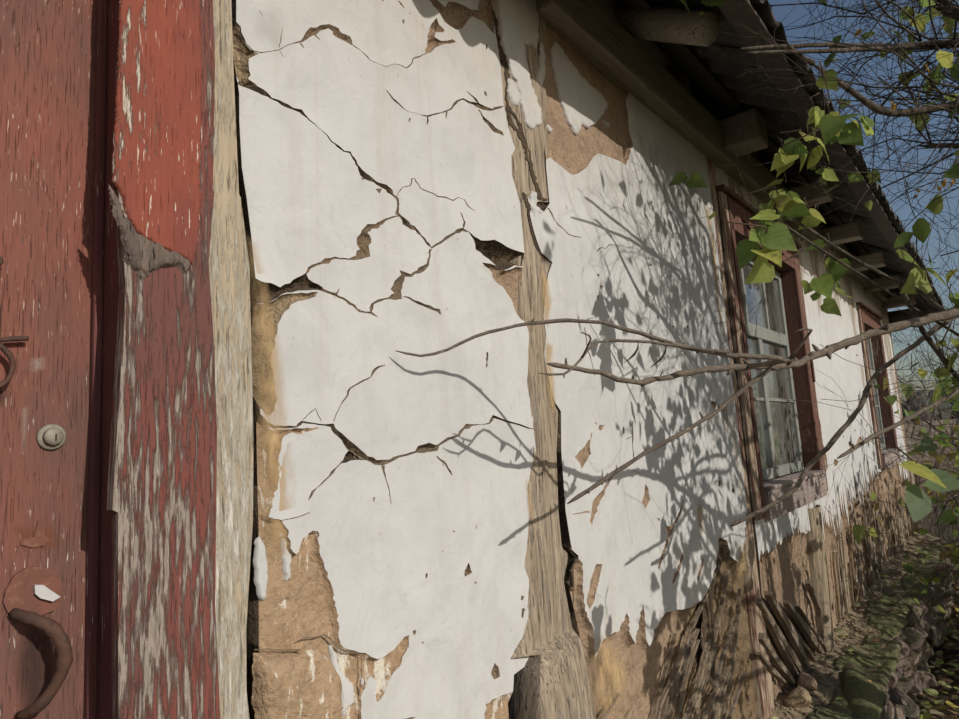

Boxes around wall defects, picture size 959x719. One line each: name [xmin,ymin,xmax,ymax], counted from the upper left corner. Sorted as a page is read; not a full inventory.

crack [234,24,427,68]
crack [234,81,475,317]
crack [386,0,618,263]
flaking render [425,0,633,175]
flaking render [247,274,424,719]
crack [253,365,533,524]
flaking render [484,692,512,719]
crack [568,544,577,605]
flaking render [575,422,604,469]
flaking render [562,537,757,719]
flaking render [757,525,817,700]
flaking render [812,334,914,631]